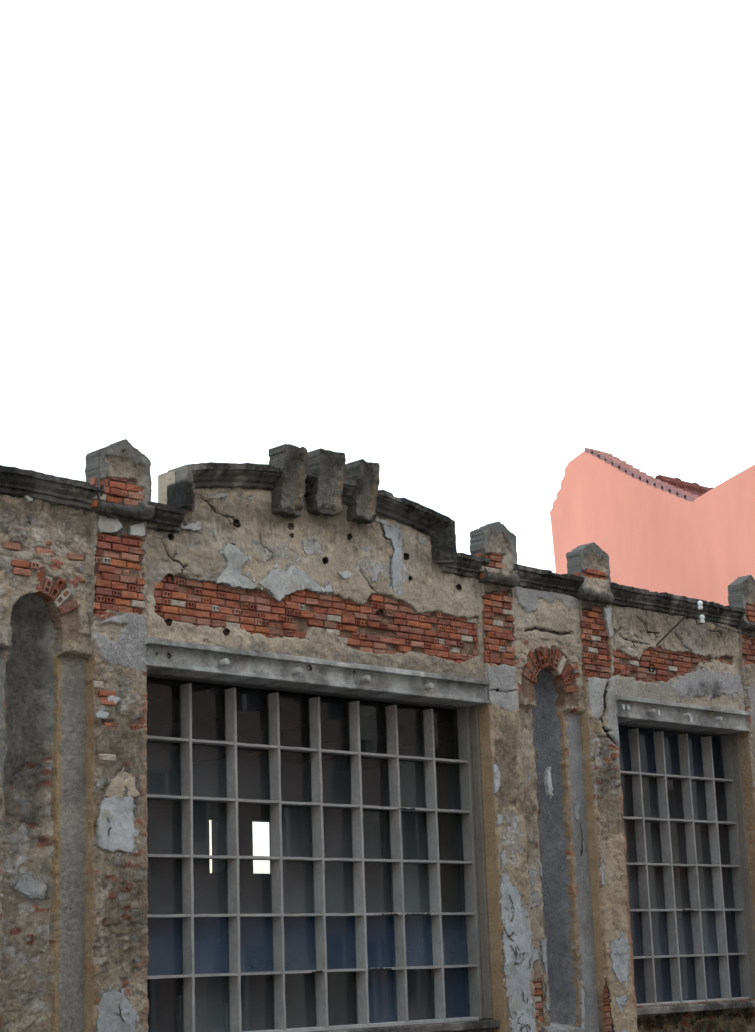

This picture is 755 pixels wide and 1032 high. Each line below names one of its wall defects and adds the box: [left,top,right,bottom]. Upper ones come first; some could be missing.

flaking render [2,542,54,577]
flaking render [67,473,755,684]
flaking render [93,681,117,706]
peeling [499,850,549,1032]
peeling [602,932,630,1032]